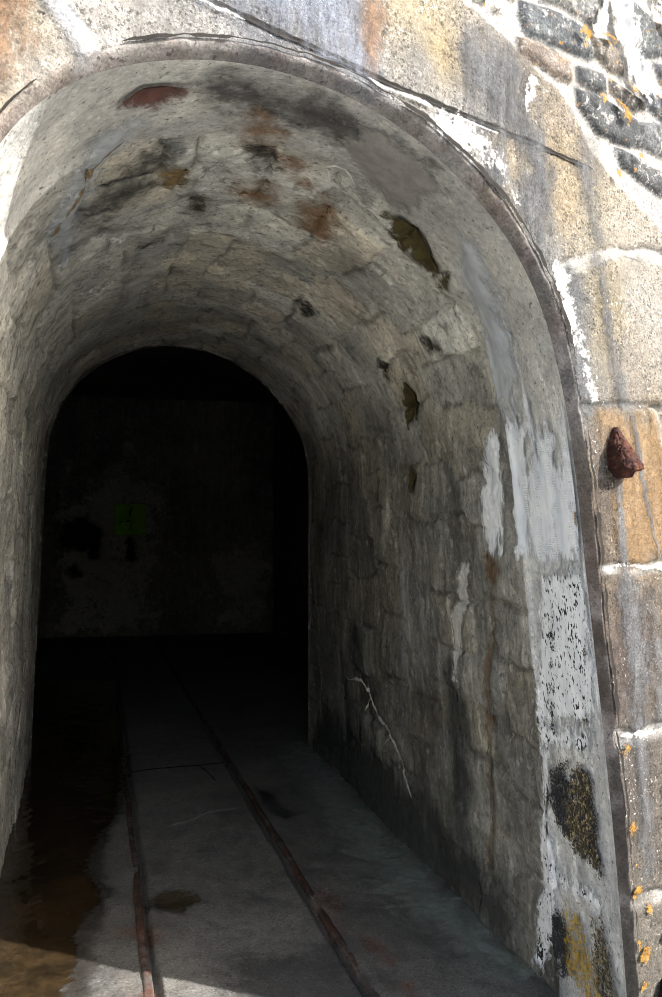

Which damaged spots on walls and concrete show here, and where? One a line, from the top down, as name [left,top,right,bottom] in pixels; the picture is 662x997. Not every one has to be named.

crack [0,79,36,113]
crack [120,0,593,365]
spalling [379,211,450,291]
damp [370,30,555,243]
damp [552,259,598,415]
corrosion [603,414,662,561]
damp [614,415,662,876]